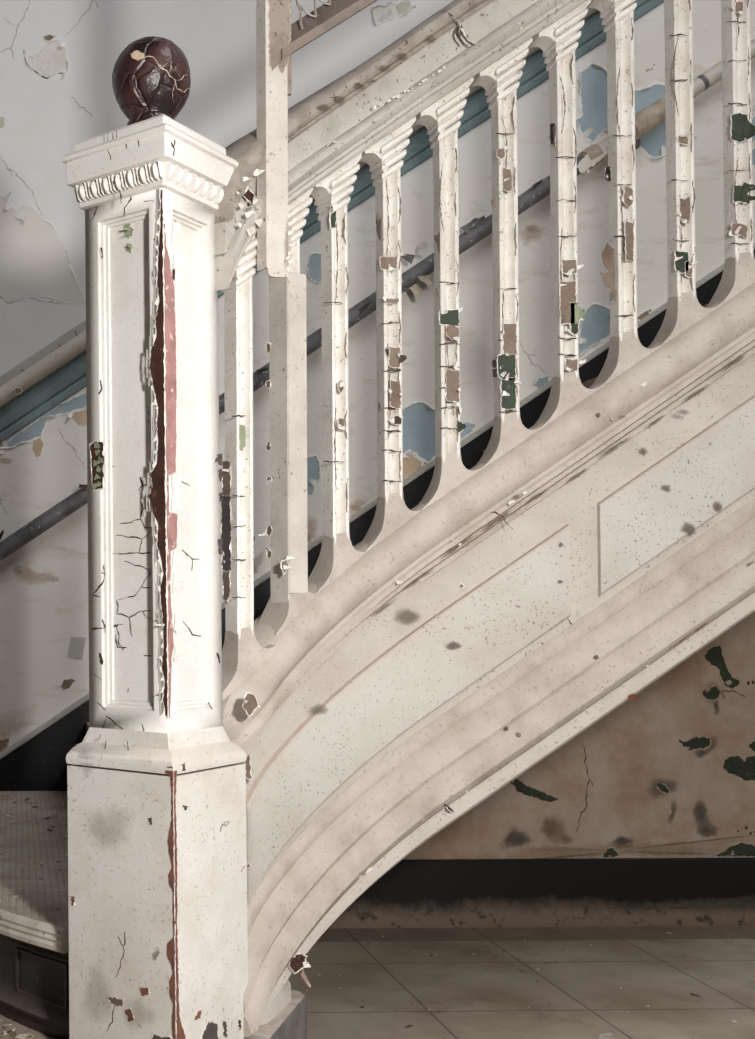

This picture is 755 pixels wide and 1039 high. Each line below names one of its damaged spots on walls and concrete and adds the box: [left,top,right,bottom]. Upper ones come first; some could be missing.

crack [0,0,63,79]
crack [71,97,139,160]
crack [142,56,190,101]
peeling [576,63,608,144]
peeling [730,110,755,166]
peeling [146,189,183,718]
peeling [378,346,436,480]
crack [75,477,151,750]
crack [576,742,593,832]
peeling [151,763,189,1039]
crack [116,931,126,977]
peeling [194,1009,242,1039]